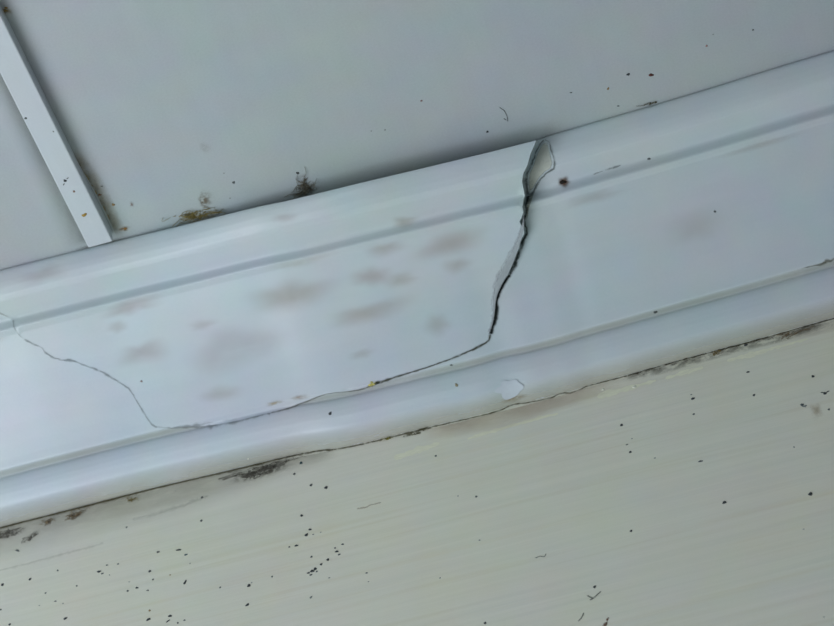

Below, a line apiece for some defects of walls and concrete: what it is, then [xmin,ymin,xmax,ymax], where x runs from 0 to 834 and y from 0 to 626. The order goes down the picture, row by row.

crack [271,140,555,413]